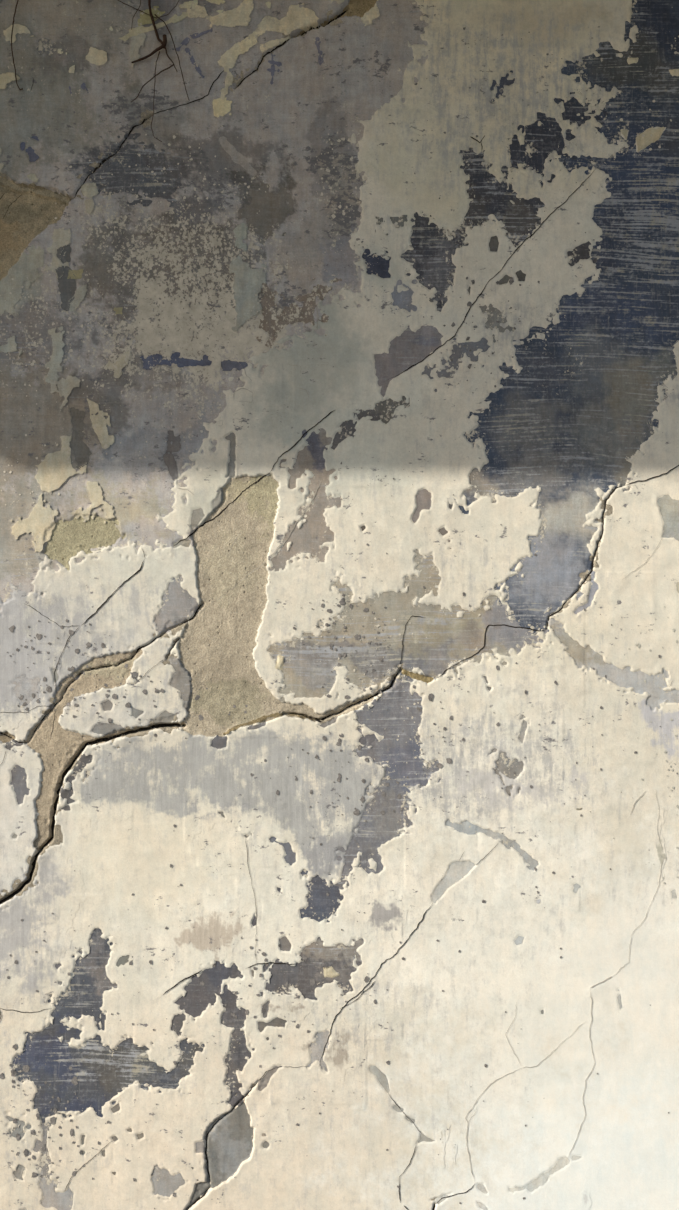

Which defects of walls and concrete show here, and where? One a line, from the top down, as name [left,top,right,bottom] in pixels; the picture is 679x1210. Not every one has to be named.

crack [73,10,346,199]
crack [395,167,598,377]
peeling [0,0,679,922]
crack [0,364,335,907]
crack [282,616,424,724]
crack [439,465,679,677]
crack [163,970,202,995]
peeling [7,928,364,1210]
crack [246,845,292,968]
crack [187,905,432,1210]
crack [388,792,664,1210]